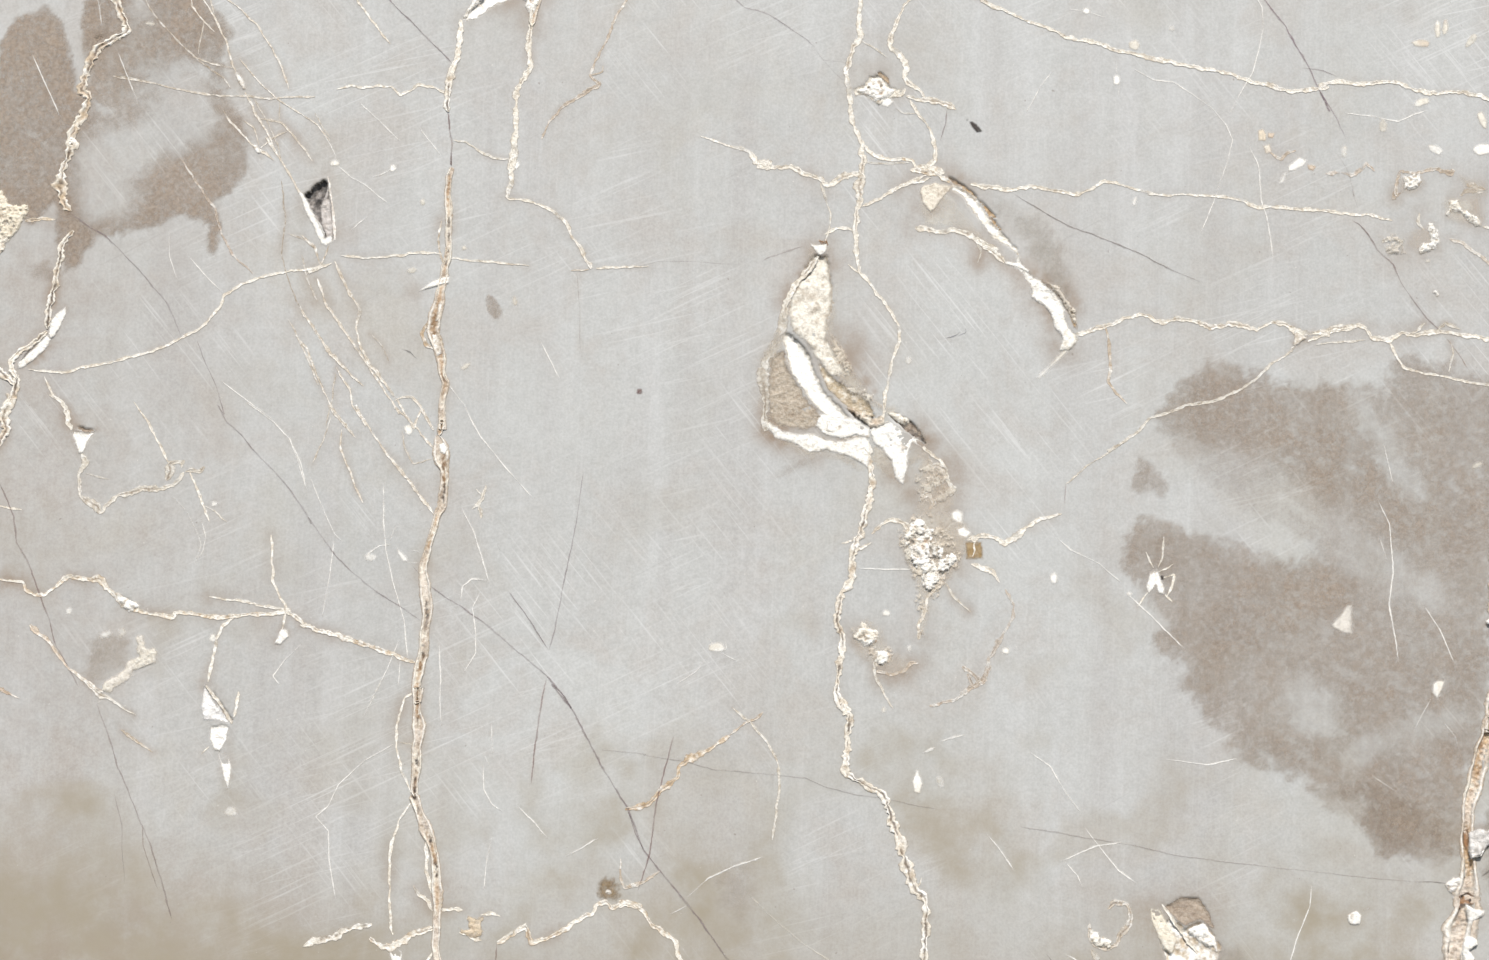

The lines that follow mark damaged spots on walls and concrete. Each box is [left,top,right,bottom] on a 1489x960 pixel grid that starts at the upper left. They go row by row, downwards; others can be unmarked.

water stain [0,0,243,266]
spalling [299,178,336,245]
crack [0,0,781,960]
spalling [757,240,946,497]
spalling [871,517,970,639]
spalling [903,167,1077,377]
crack [701,0,1393,960]
crack [967,313,1489,583]
water stain [1176,565,1357,691]
water stain [1180,376,1489,566]
spalling [1151,897,1221,960]
crack [1441,691,1489,960]